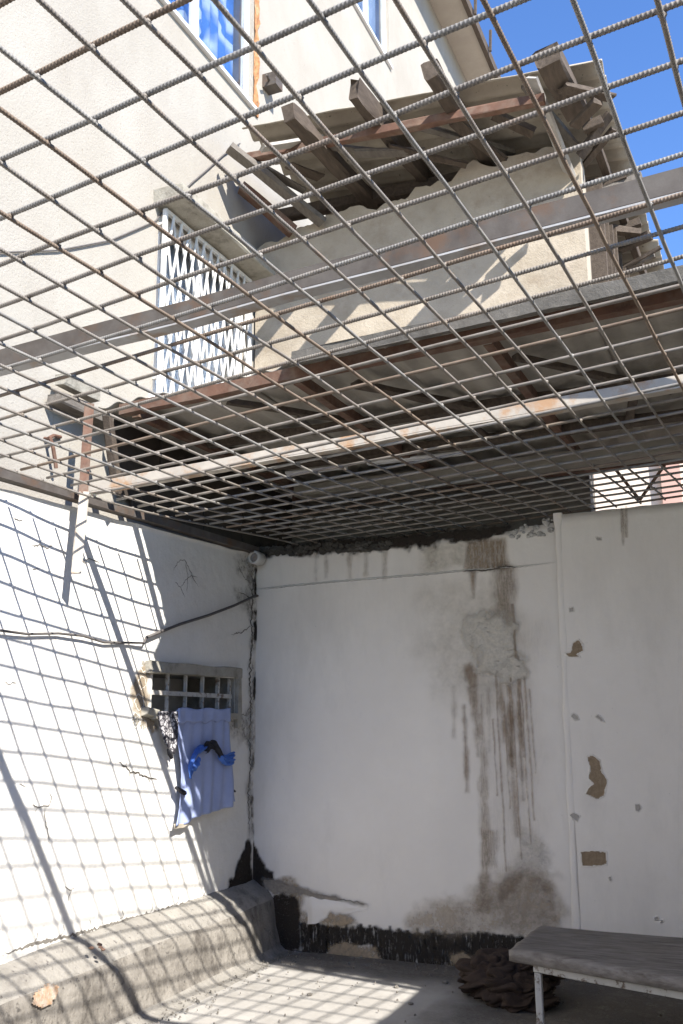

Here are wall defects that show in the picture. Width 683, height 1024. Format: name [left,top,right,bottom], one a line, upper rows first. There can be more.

spalling [564,639,589,663]
spalling [581,746,616,806]
water stain [228,840,273,889]
spalling [574,843,608,875]